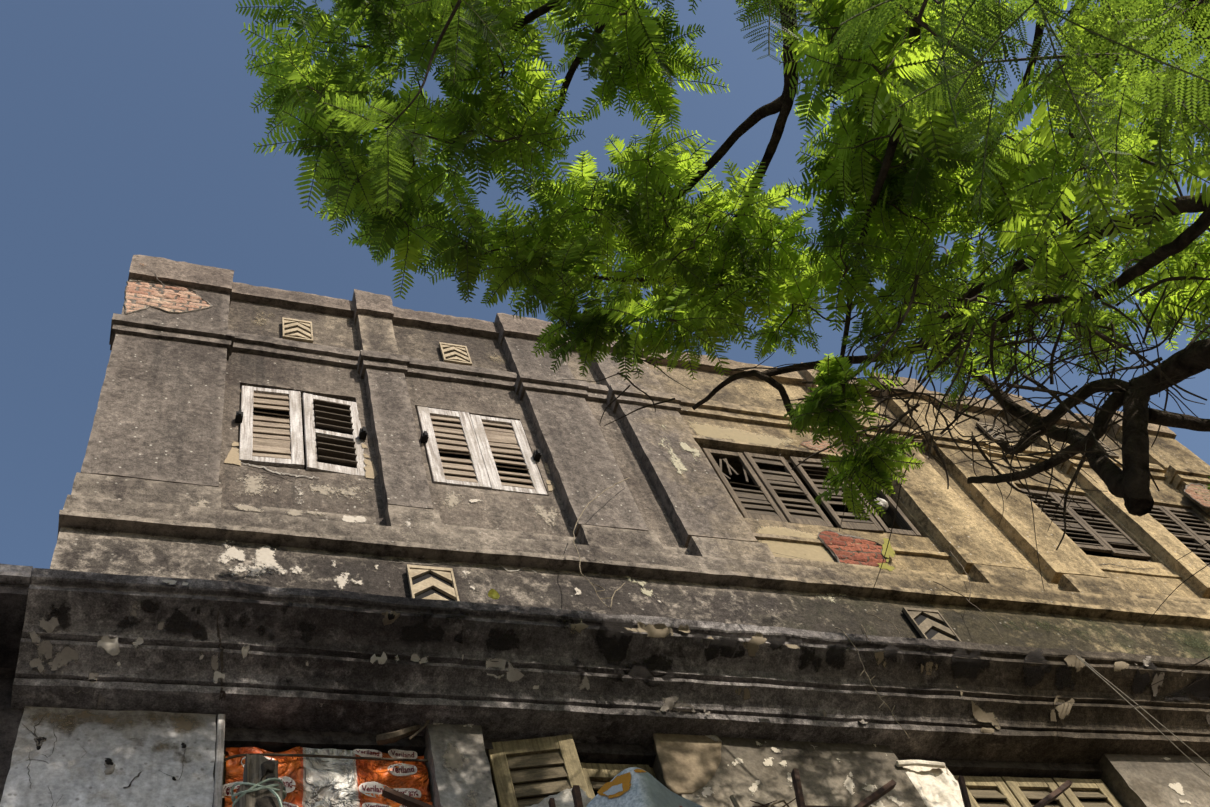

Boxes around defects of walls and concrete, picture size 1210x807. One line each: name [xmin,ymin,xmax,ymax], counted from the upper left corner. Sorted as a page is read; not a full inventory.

peeling [29,600,79,673]
spalling [97,600,275,666]
spalling [915,645,1001,734]
spalling [1023,648,1085,721]
spalling [1114,656,1210,725]
peeling [756,741,792,789]
peeling [844,772,904,807]